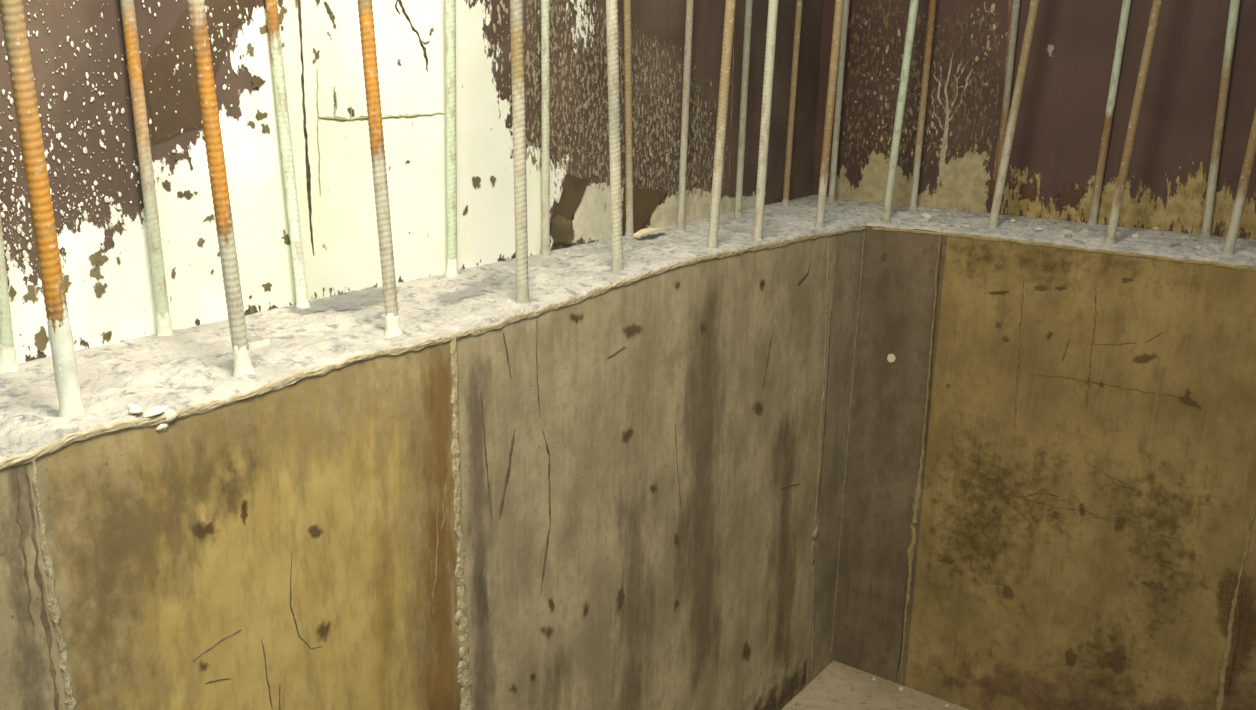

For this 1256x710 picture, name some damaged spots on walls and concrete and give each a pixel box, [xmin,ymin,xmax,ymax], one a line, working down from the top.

crack [298,0,440,256]
peeling [0,0,779,417]
spalling [781,0,803,207]
peeling [814,0,1256,256]
spalling [127,404,179,433]
damp [755,663,807,710]
damp [1220,575,1256,691]